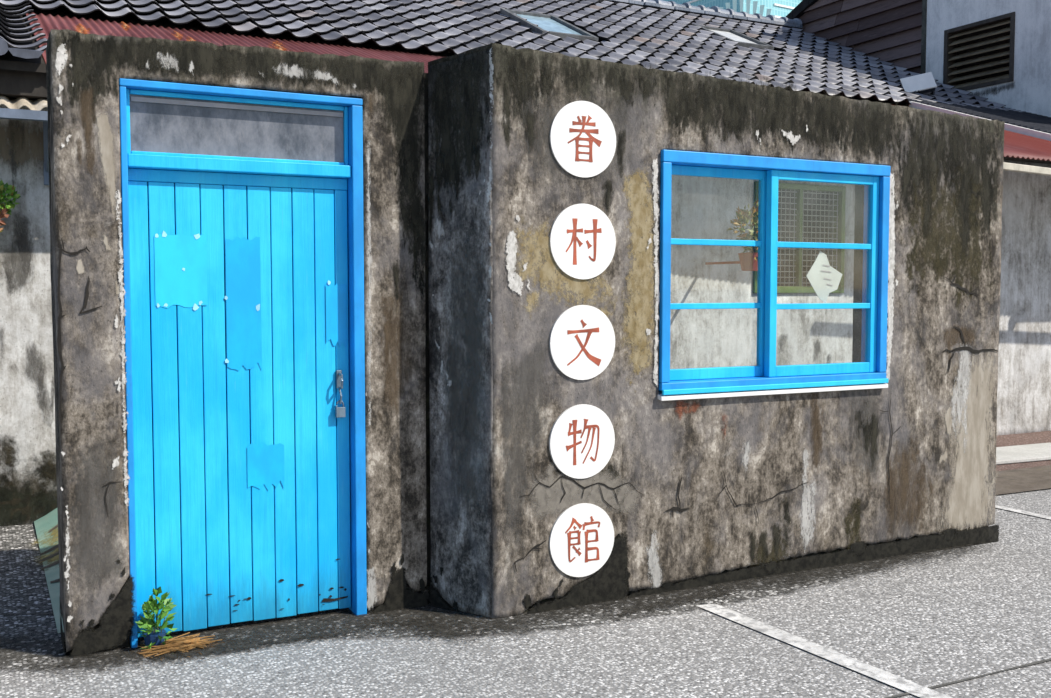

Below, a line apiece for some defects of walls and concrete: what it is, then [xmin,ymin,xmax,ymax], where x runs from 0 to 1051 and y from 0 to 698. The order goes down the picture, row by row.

leakage [0,32,1002,372]
leakage [0,240,58,527]
crack [57,205,102,451]
leakage [445,243,484,501]
leakage [947,342,972,453]
crack [519,473,642,509]
leakage [599,464,624,515]
crack [665,477,689,517]
crack [717,471,809,524]